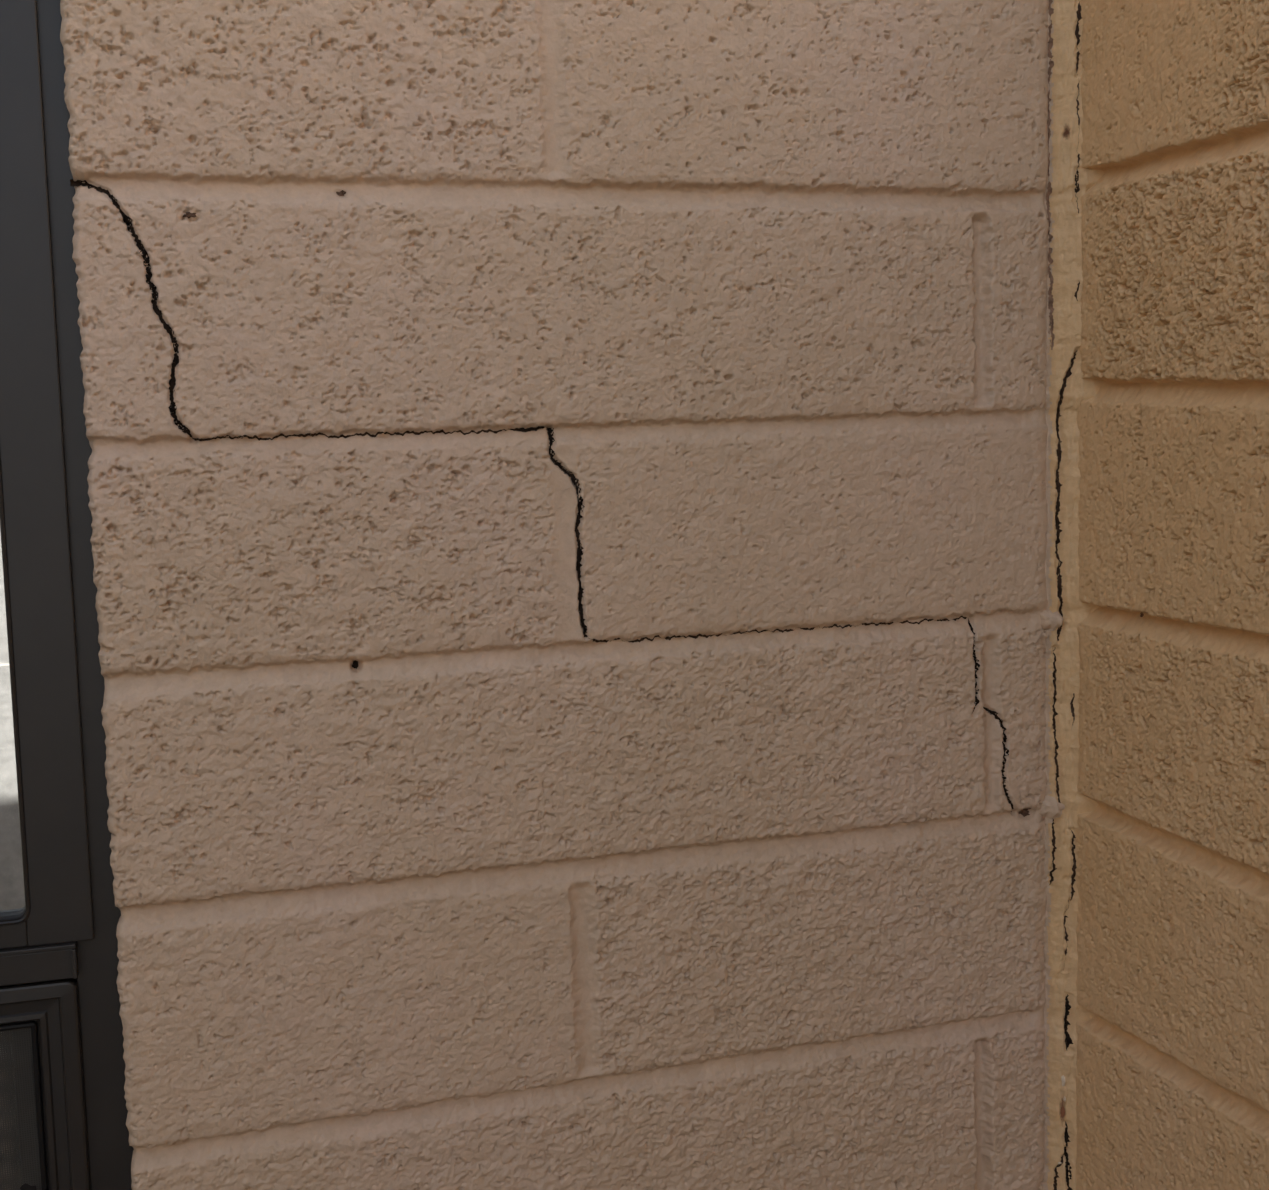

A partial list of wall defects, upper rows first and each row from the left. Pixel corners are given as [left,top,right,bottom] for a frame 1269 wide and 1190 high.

crack [70,179,1014,812]
crack [1045,0,1082,1050]
crack [1053,1122,1073,1190]